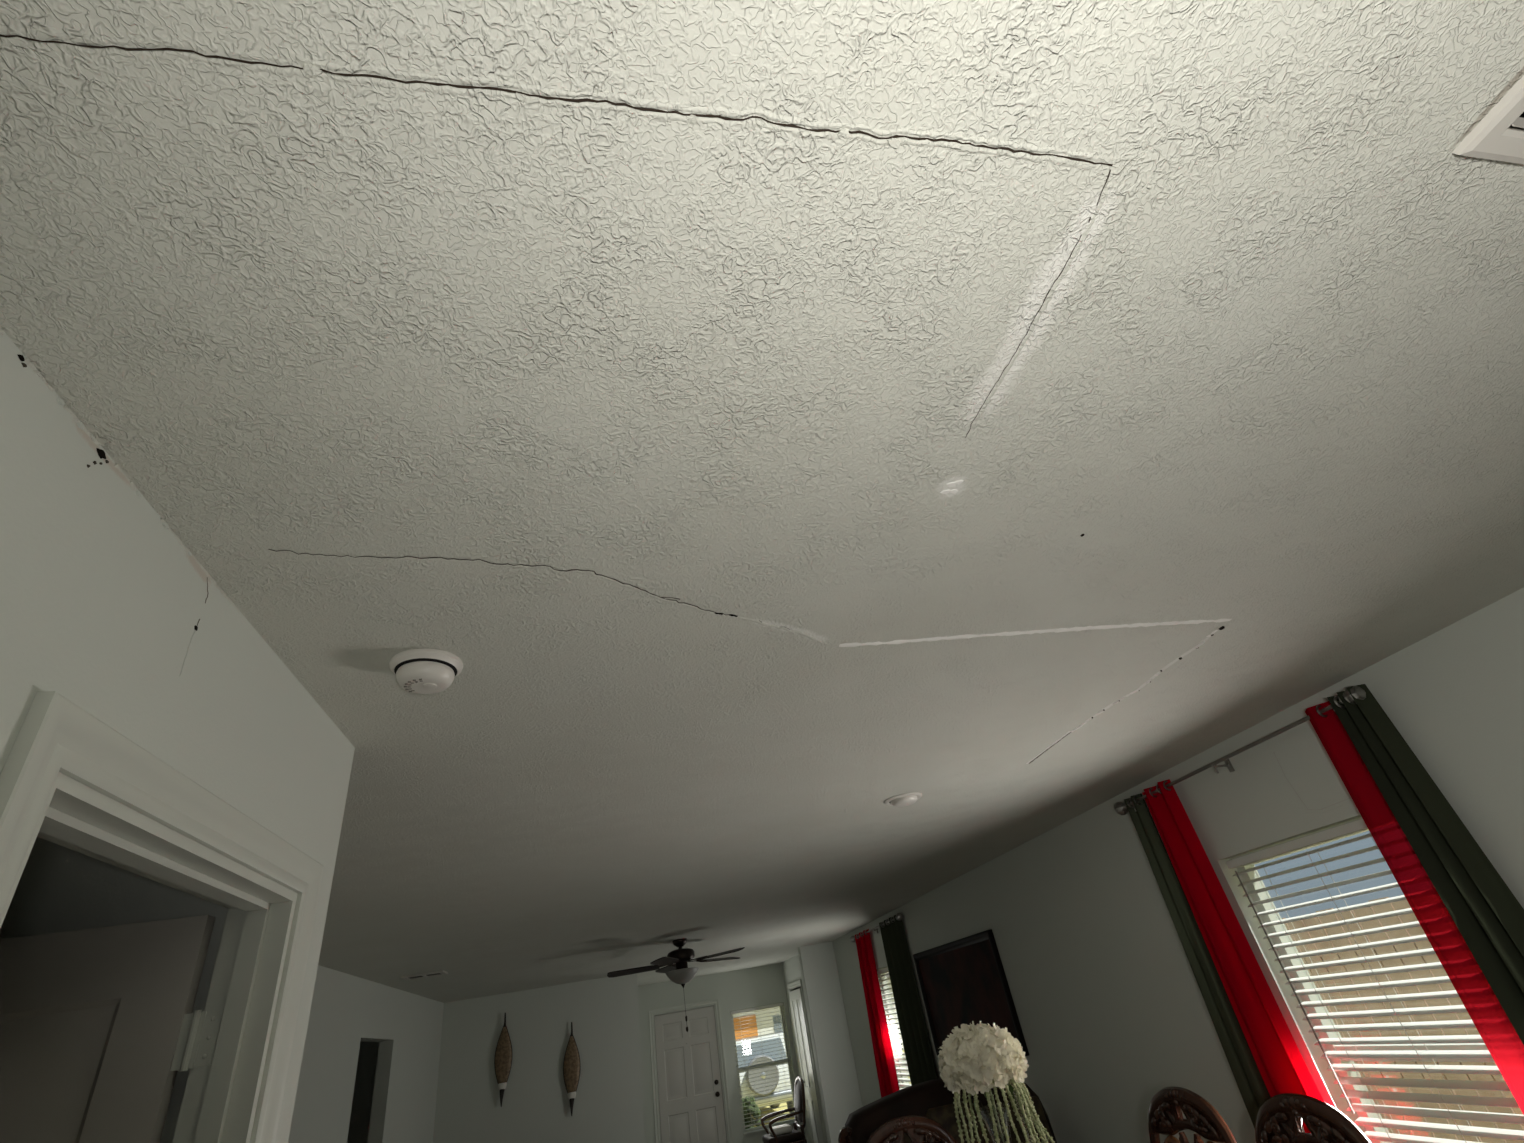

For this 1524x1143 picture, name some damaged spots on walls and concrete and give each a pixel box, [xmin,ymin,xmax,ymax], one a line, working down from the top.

crack [0,24,1150,439]
crack [267,549,838,648]
crack [1026,628,1221,764]